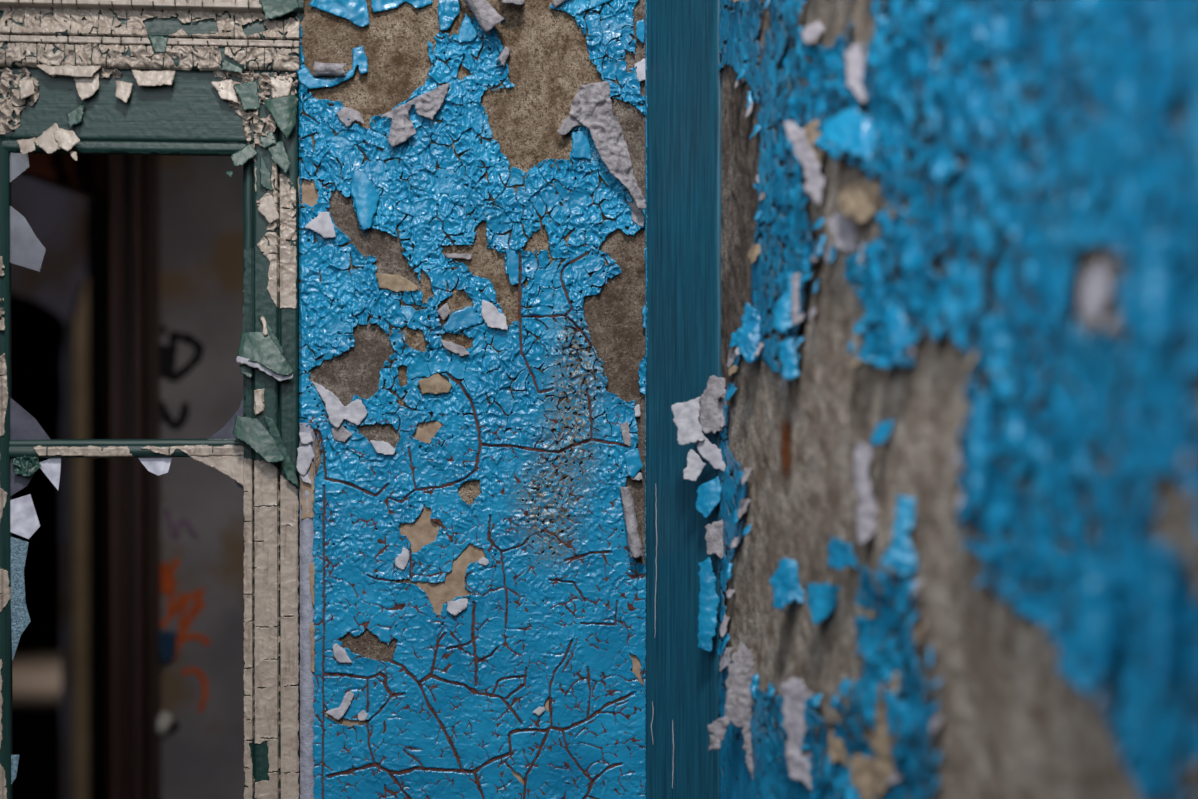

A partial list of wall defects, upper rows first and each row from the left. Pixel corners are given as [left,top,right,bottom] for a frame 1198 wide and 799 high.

peeling [7,0,646,799]
crack [313,373,634,799]
crack [518,252,592,393]
peeling [671,0,1157,799]
peeling [1138,451,1198,603]